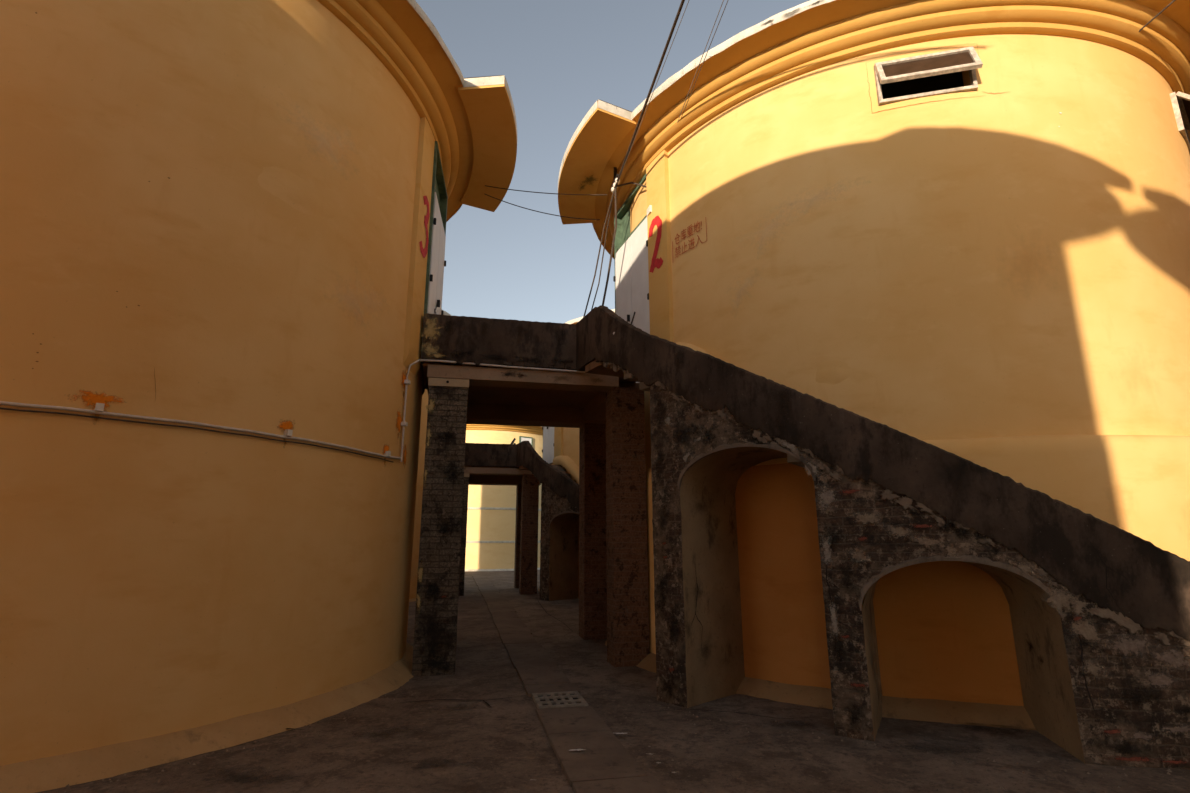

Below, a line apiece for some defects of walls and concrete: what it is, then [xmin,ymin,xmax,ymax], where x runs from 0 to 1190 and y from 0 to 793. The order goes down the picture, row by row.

flaking render [850,489,996,562]
flaking render [1008,557,1190,688]